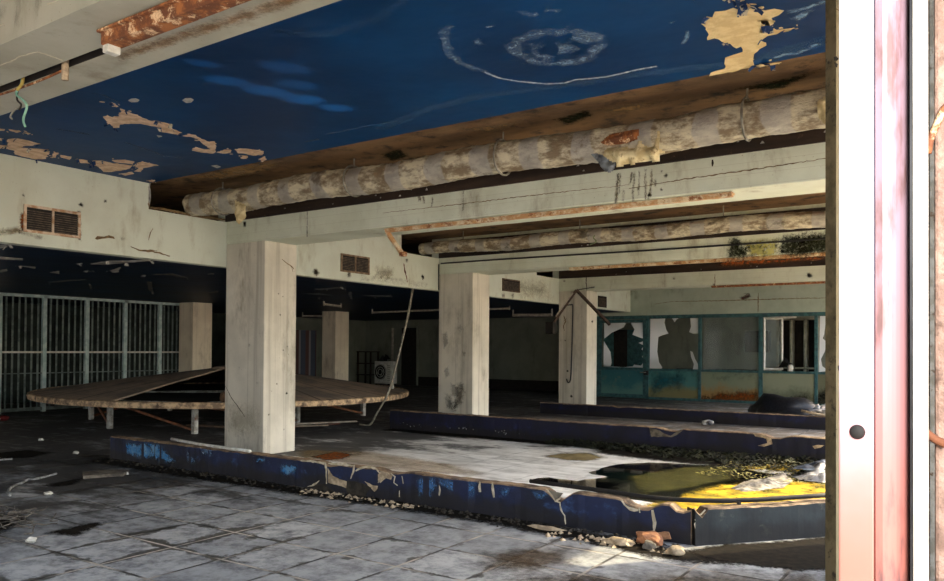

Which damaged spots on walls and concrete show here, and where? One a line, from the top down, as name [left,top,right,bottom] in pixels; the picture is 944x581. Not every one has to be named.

rust [120,0,294,57]
peeling [701,0,798,76]
peeling [99,98,267,168]
peeling [0,129,225,220]
damp [727,232,825,259]
spalling [305,469,393,497]
peeling [418,479,453,494]
spalling [636,531,671,546]
damp [489,549,580,581]